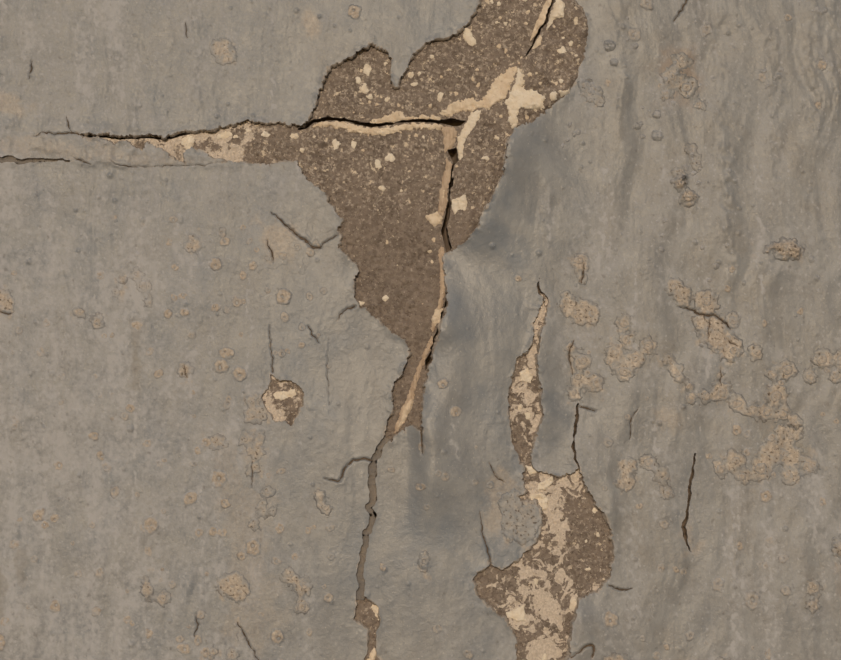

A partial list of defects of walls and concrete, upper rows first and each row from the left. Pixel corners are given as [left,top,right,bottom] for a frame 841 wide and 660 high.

crack [0,156,203,167]
crack [36,117,190,140]
crack [271,212,337,249]
peeling [83,0,588,442]
crack [300,0,565,600]
peeling [473,293,614,660]
crack [571,405,595,467]
crack [681,455,695,551]